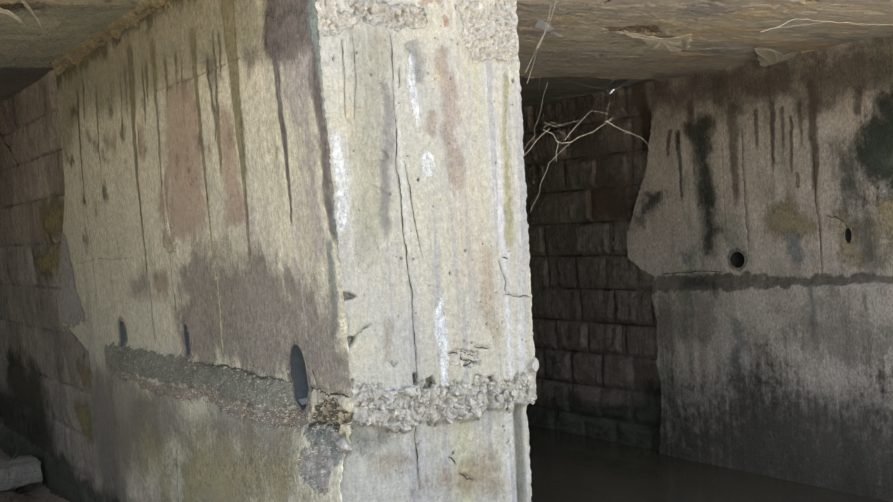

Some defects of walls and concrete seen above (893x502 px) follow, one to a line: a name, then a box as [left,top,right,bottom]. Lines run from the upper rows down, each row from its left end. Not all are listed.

peeling [0,0,46,35]
spalling [49,0,190,90]
damp [408,52,420,121]
damp [633,38,893,192]
damp [33,195,64,277]
damp [75,0,351,502]
damp [765,199,817,262]
spalling [106,364,353,495]
crack [194,362,287,382]
crack [309,420,340,428]
crack [311,370,349,398]
damp [659,344,893,502]